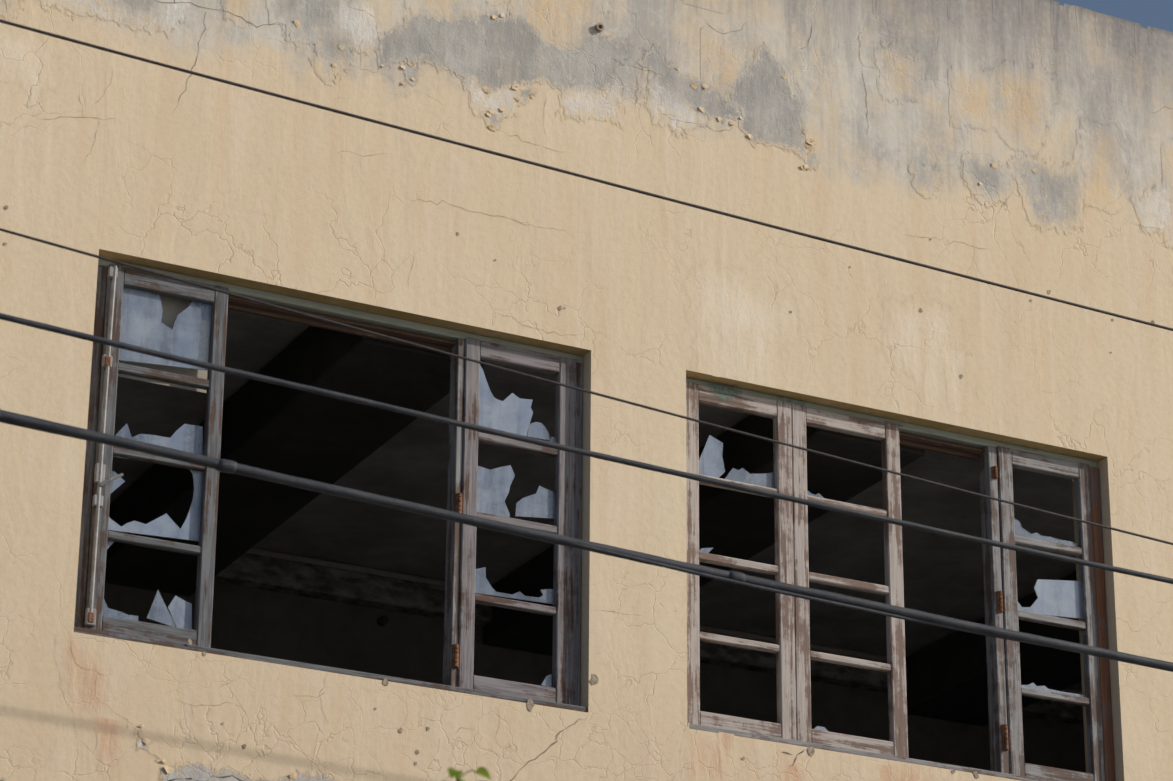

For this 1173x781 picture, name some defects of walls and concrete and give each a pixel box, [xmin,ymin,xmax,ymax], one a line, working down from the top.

leakage [0,18,65,113]
crack [156,0,293,112]
leakage [221,0,260,29]
leakage [332,0,382,58]
leakage [404,0,611,53]
peeling [372,7,821,171]
leakage [642,70,709,139]
crack [858,35,869,131]
leakage [948,59,1062,156]
crack [168,773,243,781]
peeling [127,722,338,781]
crack [510,715,589,781]